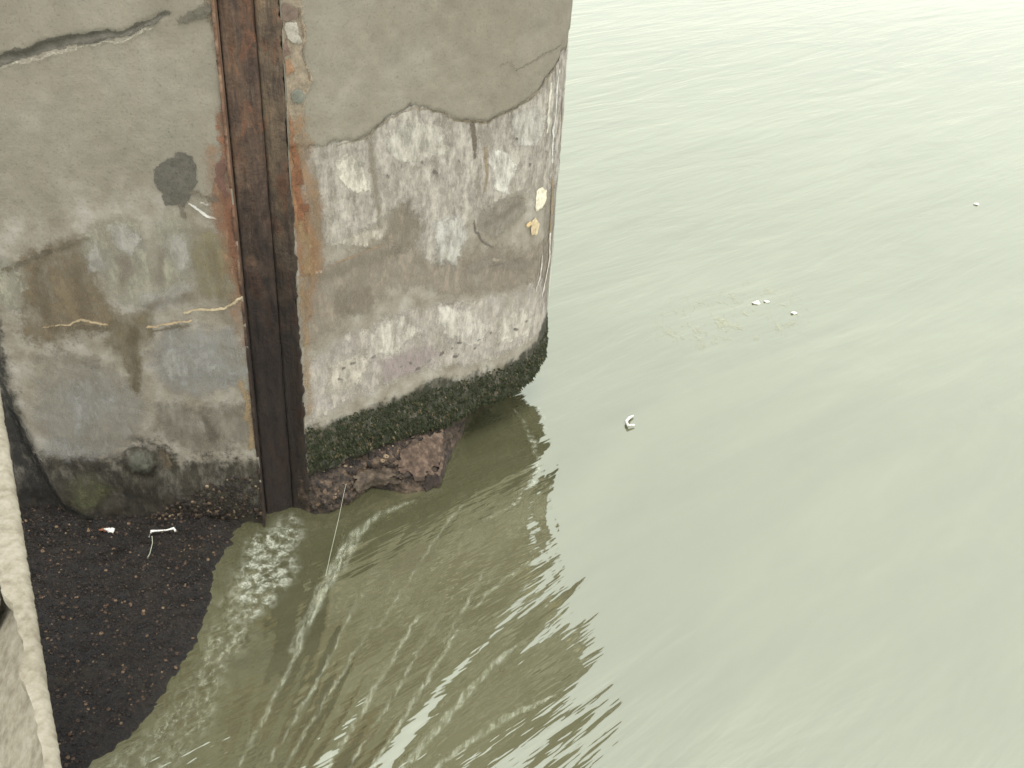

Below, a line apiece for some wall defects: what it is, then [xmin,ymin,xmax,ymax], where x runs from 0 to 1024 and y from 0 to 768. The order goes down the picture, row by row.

crack [0,3,212,68]
damp [154,152,219,219]
rust [207,114,242,322]
rust [289,117,322,314]
peeling [301,33,569,423]
crack [43,319,112,331]
crack [146,296,242,333]